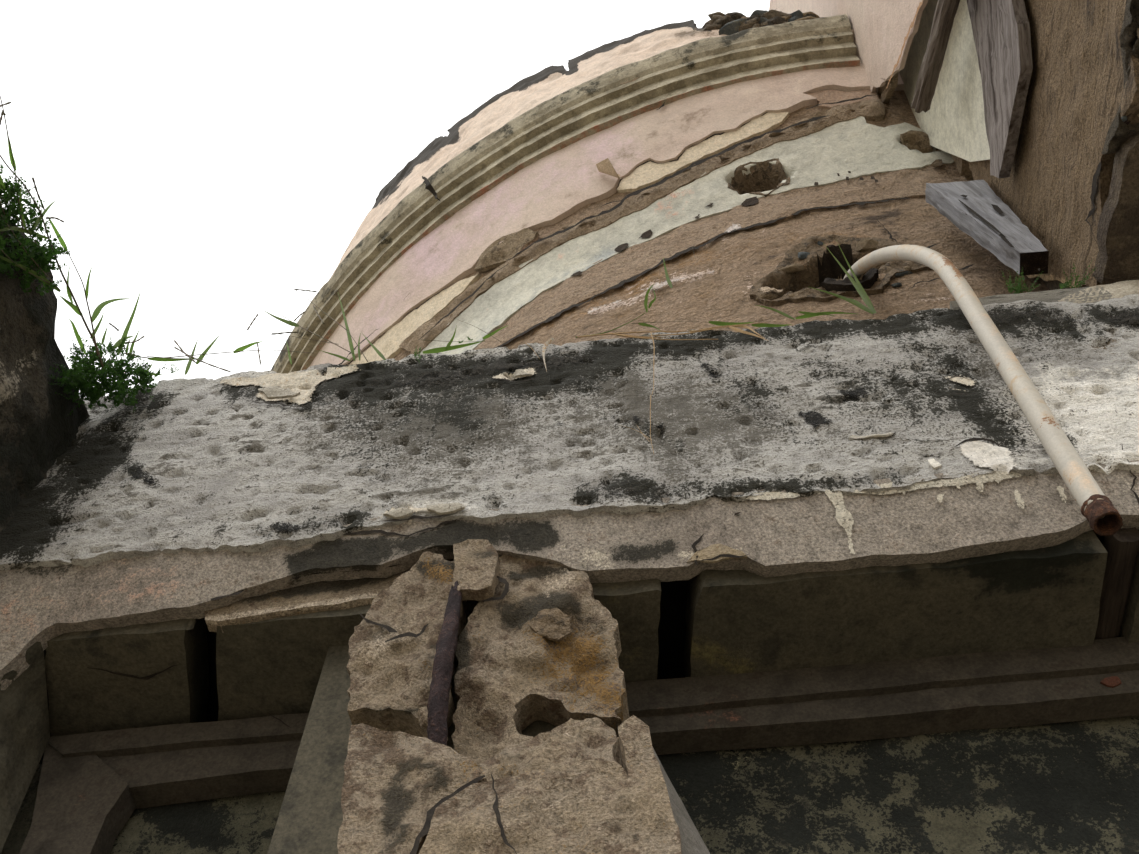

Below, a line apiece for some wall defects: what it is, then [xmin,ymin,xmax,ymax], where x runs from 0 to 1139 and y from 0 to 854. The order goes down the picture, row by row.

spalling [217,0,932,408]
leakage [988,305,1139,330]
leakage [371,354,602,391]
leakage [733,487,800,500]
leakage [819,471,1025,554]
peeling [955,438,1017,475]
crack [1122,446,1139,503]
peeling [452,539,500,601]
spalling [529,608,572,642]
crack [410,774,517,854]